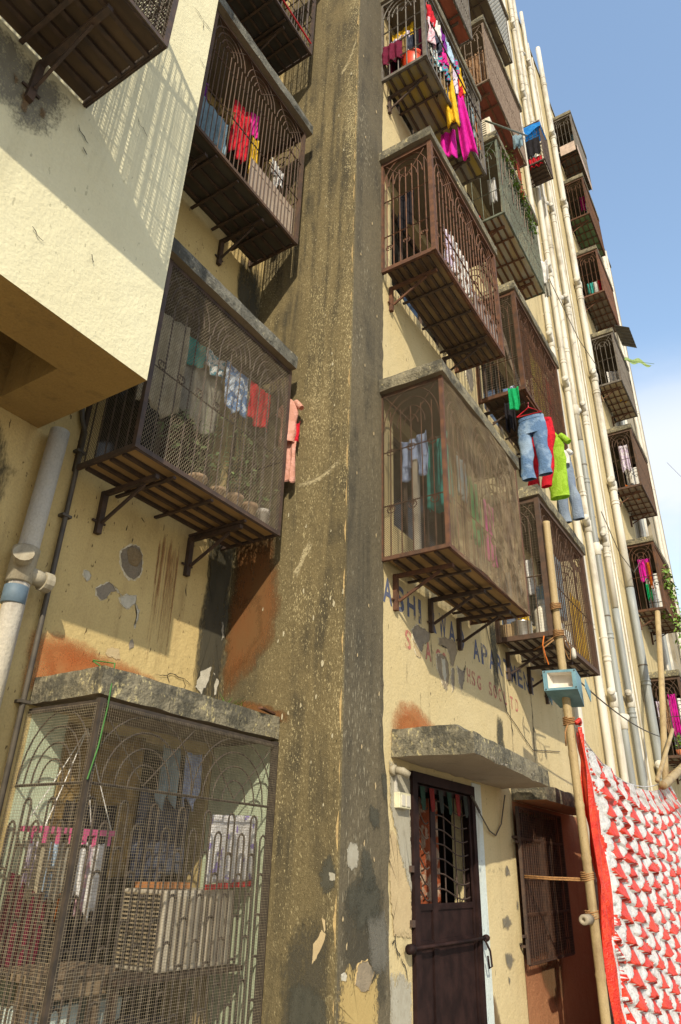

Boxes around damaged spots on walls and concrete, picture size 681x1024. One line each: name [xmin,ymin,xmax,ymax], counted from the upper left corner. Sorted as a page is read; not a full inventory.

leakage [0,29,66,134]
spalling [82,544,143,660]
rust [223,538,278,692]
rust [30,634,150,688]
spalling [195,667,219,695]
rust [393,706,431,729]
peeling [336,812,365,871]
peeling [312,895,347,964]
peeling [333,959,412,1024]